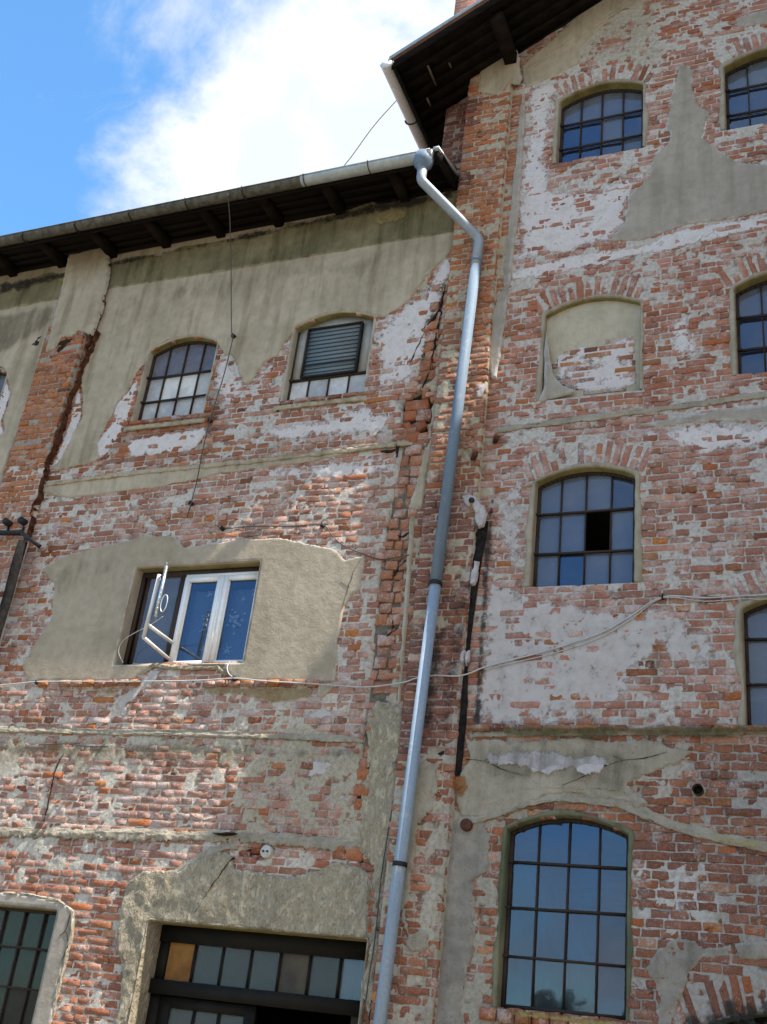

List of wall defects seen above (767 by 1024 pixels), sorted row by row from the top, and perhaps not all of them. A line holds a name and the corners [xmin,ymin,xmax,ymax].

peeling [478,0,644,379]
peeling [110,213,335,263]
crack [410,285,446,388]
spalling [539,332,636,403]
crack [24,295,106,541]
peeling [23,232,454,1024]
peeling [460,650,471,666]
crack [562,752,665,785]
crack [196,832,237,910]
peeling [436,737,691,1024]
peeling [645,937,767,1024]